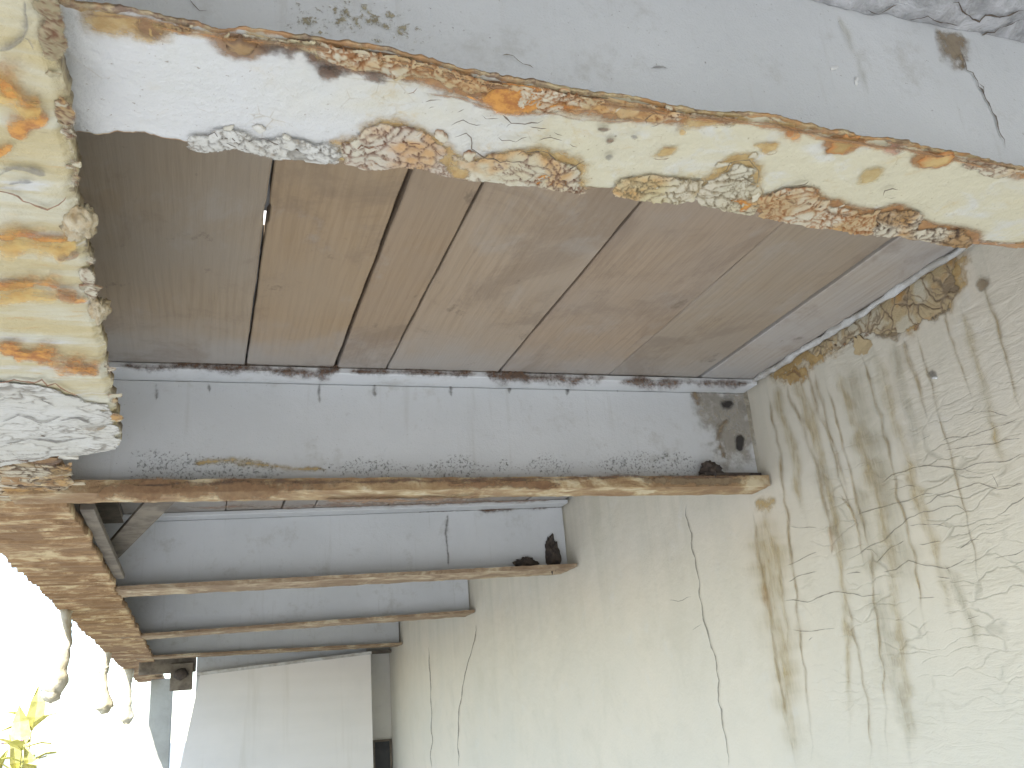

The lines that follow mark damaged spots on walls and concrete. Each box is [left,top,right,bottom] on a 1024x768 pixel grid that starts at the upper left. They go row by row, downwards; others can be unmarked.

corrosion [32,0,68,78]
corrosion [0,71,75,157]
corrosion [83,1,1024,179]
crack [963,57,1005,142]
corrosion [66,160,82,186]
peeling [187,121,585,195]
peeling [613,152,764,216]
corrosion [0,230,103,305]
peeling [0,379,122,467]
damp [129,452,324,479]
crack [674,510,729,757]
crack [428,633,476,766]